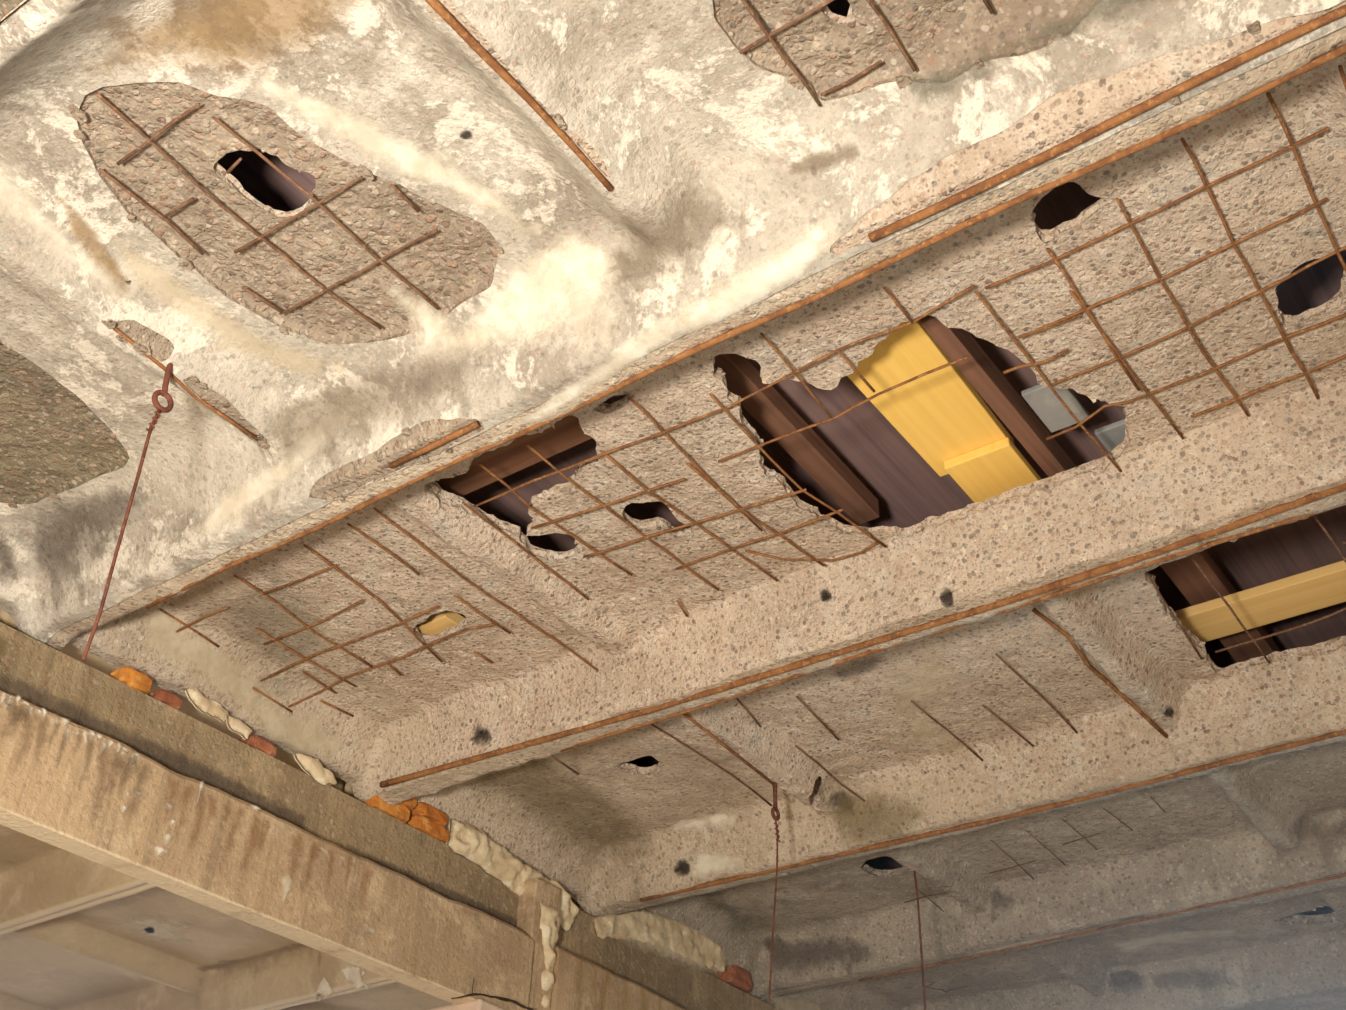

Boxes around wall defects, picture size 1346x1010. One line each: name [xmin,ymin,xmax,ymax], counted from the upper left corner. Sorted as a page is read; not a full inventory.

spalling [0,340,129,508]
spalling [68,82,503,344]
corrosion [425,0,614,192]
corrosion [145,44,1346,609]
spalling [238,54,1346,766]
spalling [713,0,1101,101]
spalling [830,0,1346,255]
corrosion [868,4,1346,243]
damp [0,693,139,767]
corrosion [379,483,1346,788]
spalling [633,547,1346,811]
damp [134,919,179,939]